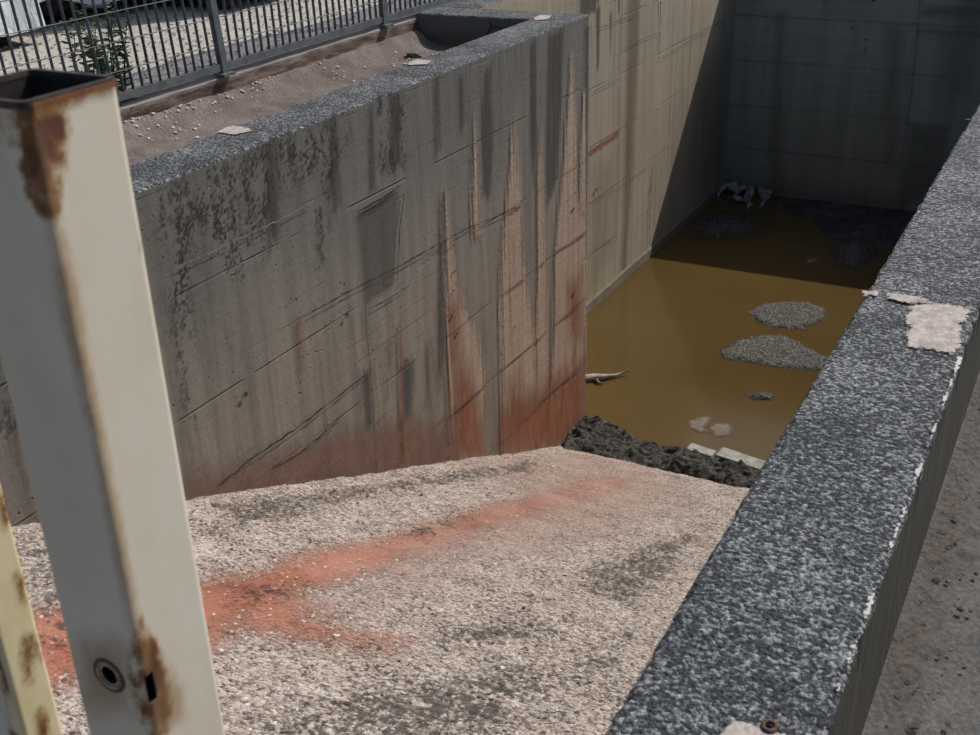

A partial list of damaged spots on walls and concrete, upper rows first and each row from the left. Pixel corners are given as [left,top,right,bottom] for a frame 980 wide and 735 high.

corrosion [14,79,118,219]
crack [170,200,316,270]
damp [156,110,348,431]
crack [216,184,518,488]
damp [426,192,486,461]
crack [504,303,581,368]
damp [498,0,611,455]
spalling [862,290,971,406]
spalling [864,581,877,626]
corrosion [37,708,50,735]
corrosion [127,617,172,735]
spalling [720,719,791,735]